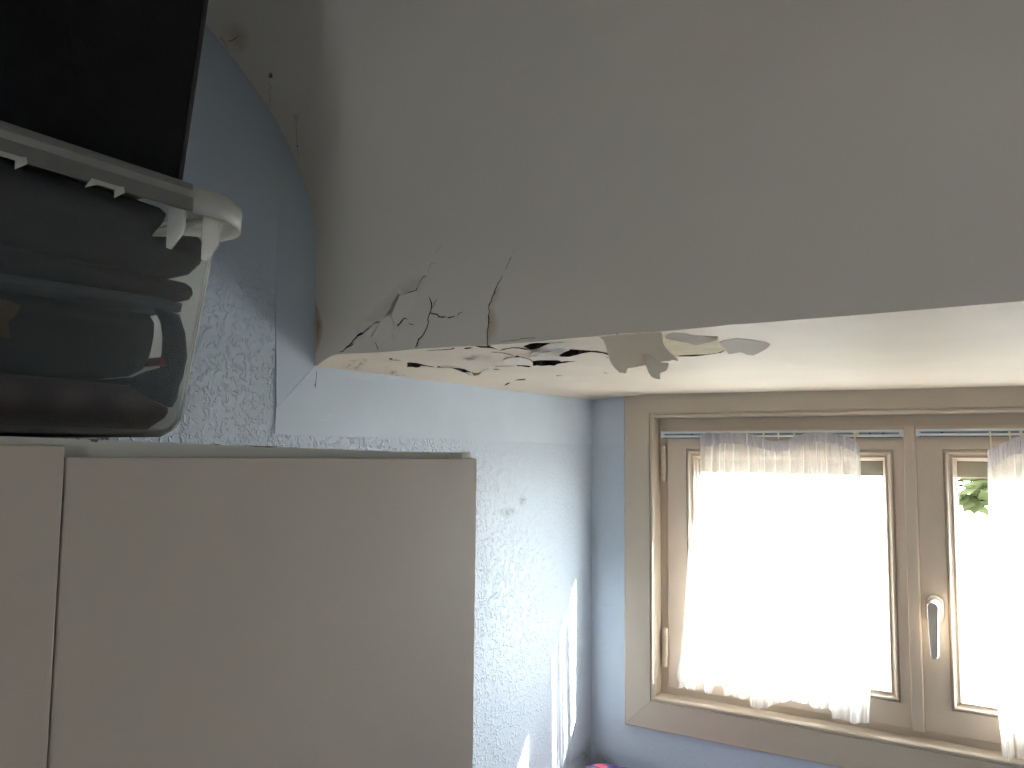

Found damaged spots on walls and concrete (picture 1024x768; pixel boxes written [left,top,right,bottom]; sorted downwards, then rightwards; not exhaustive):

crack [340,270,462,352]
crack [487,249,527,347]
peeling [407,332,770,386]